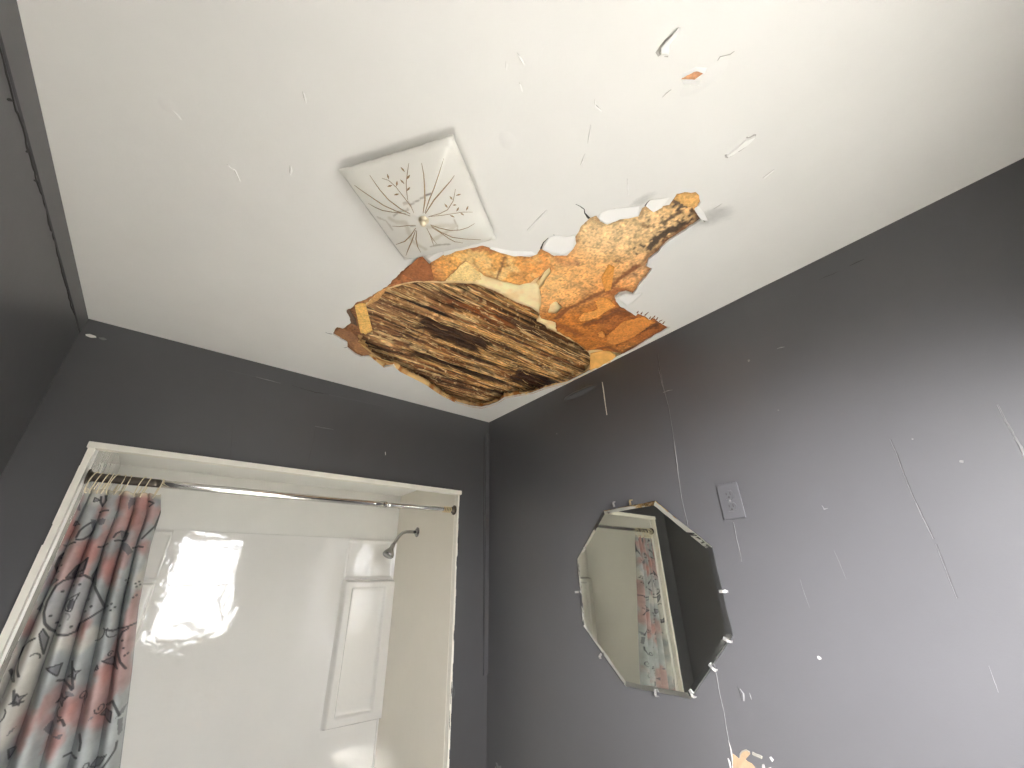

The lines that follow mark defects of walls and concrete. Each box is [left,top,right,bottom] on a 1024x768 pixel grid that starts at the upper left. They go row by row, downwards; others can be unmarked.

peeling [655,28,681,57]
spalling [682,67,707,86]
crack [0,47,75,315]
peeling [674,192,700,209]
peeling [447,262,481,281]
peeling [579,298,615,322]
peeling [598,316,655,345]
crack [657,355,688,527]
crack [890,440,958,598]
crack [714,664,732,766]
peeling [728,741,774,768]